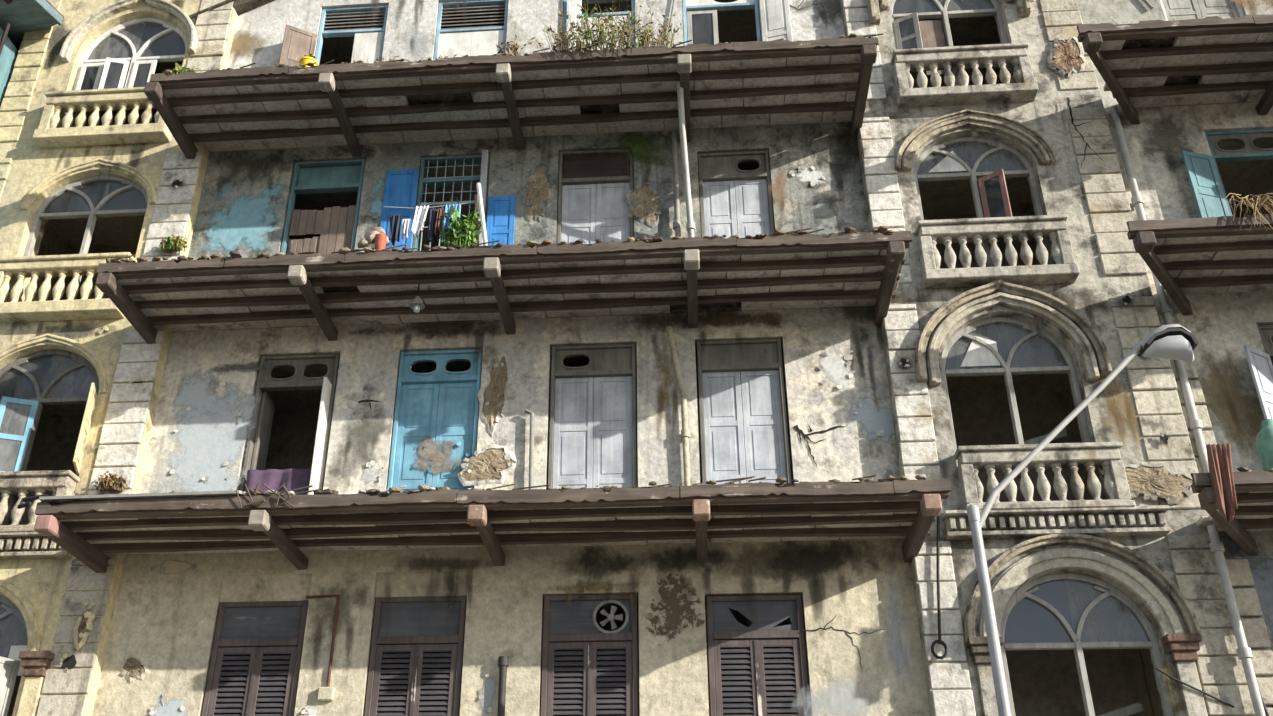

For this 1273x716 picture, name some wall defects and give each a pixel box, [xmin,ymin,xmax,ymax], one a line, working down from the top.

spalling [1047,37,1088,77]
damp [330,385,386,475]
spalling [412,353,520,486]
crack [793,423,847,467]
damp [567,548,633,600]
damp [651,541,860,607]
flaking render [646,573,705,646]
crack [803,615,887,667]